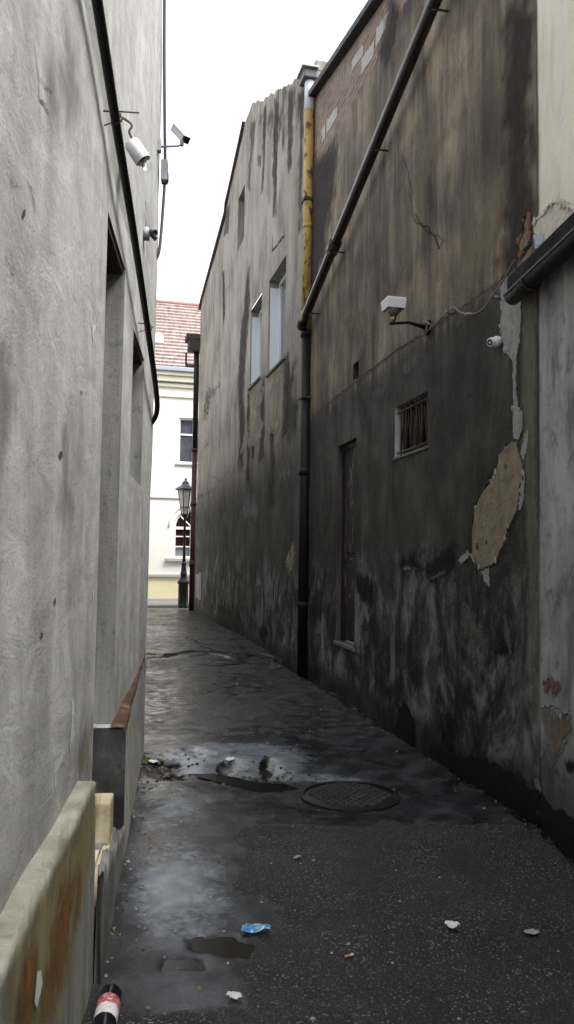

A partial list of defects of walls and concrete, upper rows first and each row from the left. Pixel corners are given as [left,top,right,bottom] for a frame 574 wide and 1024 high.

damp [378,0,397,65]
damp [261,92,336,287]
crack [399,154,445,249]
damp [454,0,535,289]
damp [238,267,298,522]
flaking render [458,198,574,586]
damp [399,545,460,598]
flaking render [539,704,574,772]